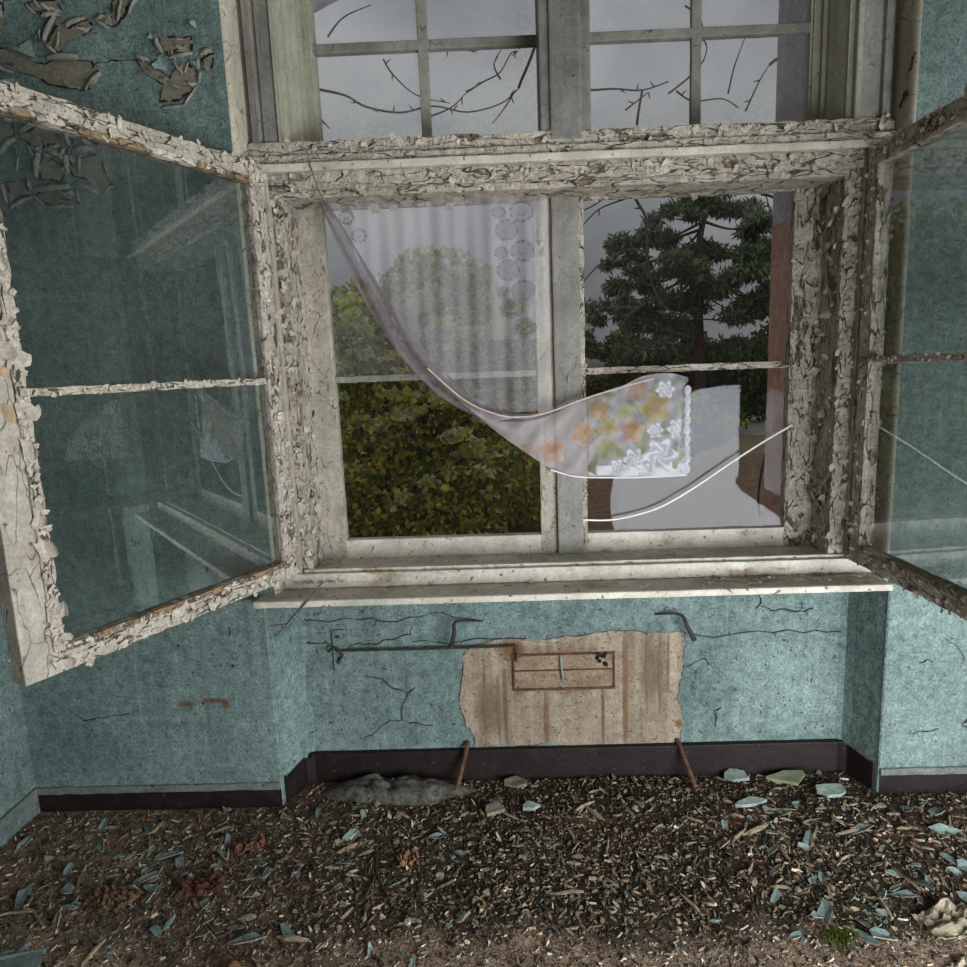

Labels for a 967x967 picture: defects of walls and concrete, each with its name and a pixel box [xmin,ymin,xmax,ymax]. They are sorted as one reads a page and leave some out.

peeling [135,20,215,109]
peeling [0,0,167,213]
peeling [343,133,444,190]
peeling [769,84,967,584]
peeling [0,139,327,670]
crack [306,612,584,647]
crack [684,596,842,668]
crack [945,639,965,664]
crack [358,675,432,740]
flaking render [459,630,685,747]
crack [913,719,967,737]